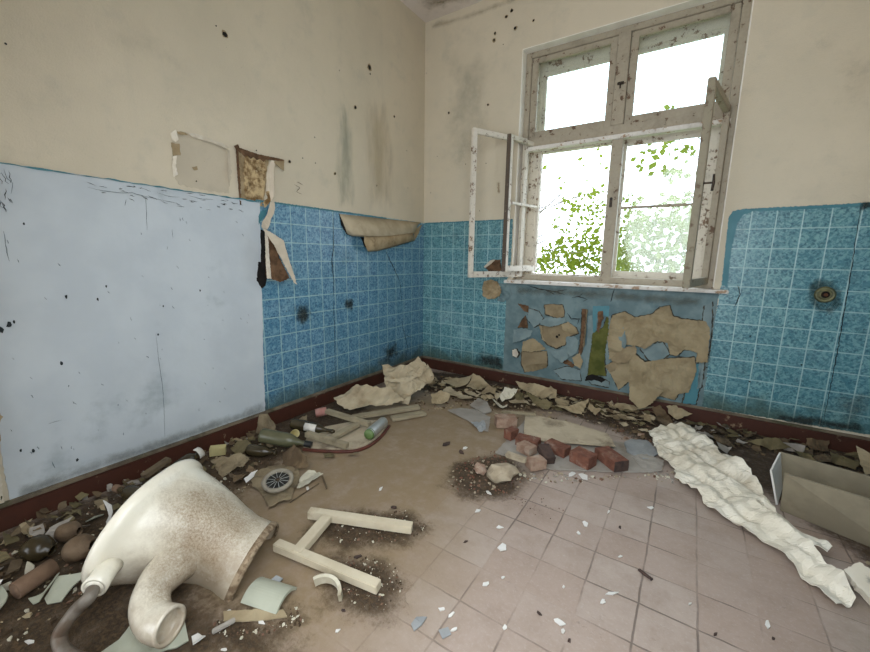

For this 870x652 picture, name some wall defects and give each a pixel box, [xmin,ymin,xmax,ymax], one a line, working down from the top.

peeling [170,130,232,193]
peeling [512,302,714,409]
crack [824,210,861,418]